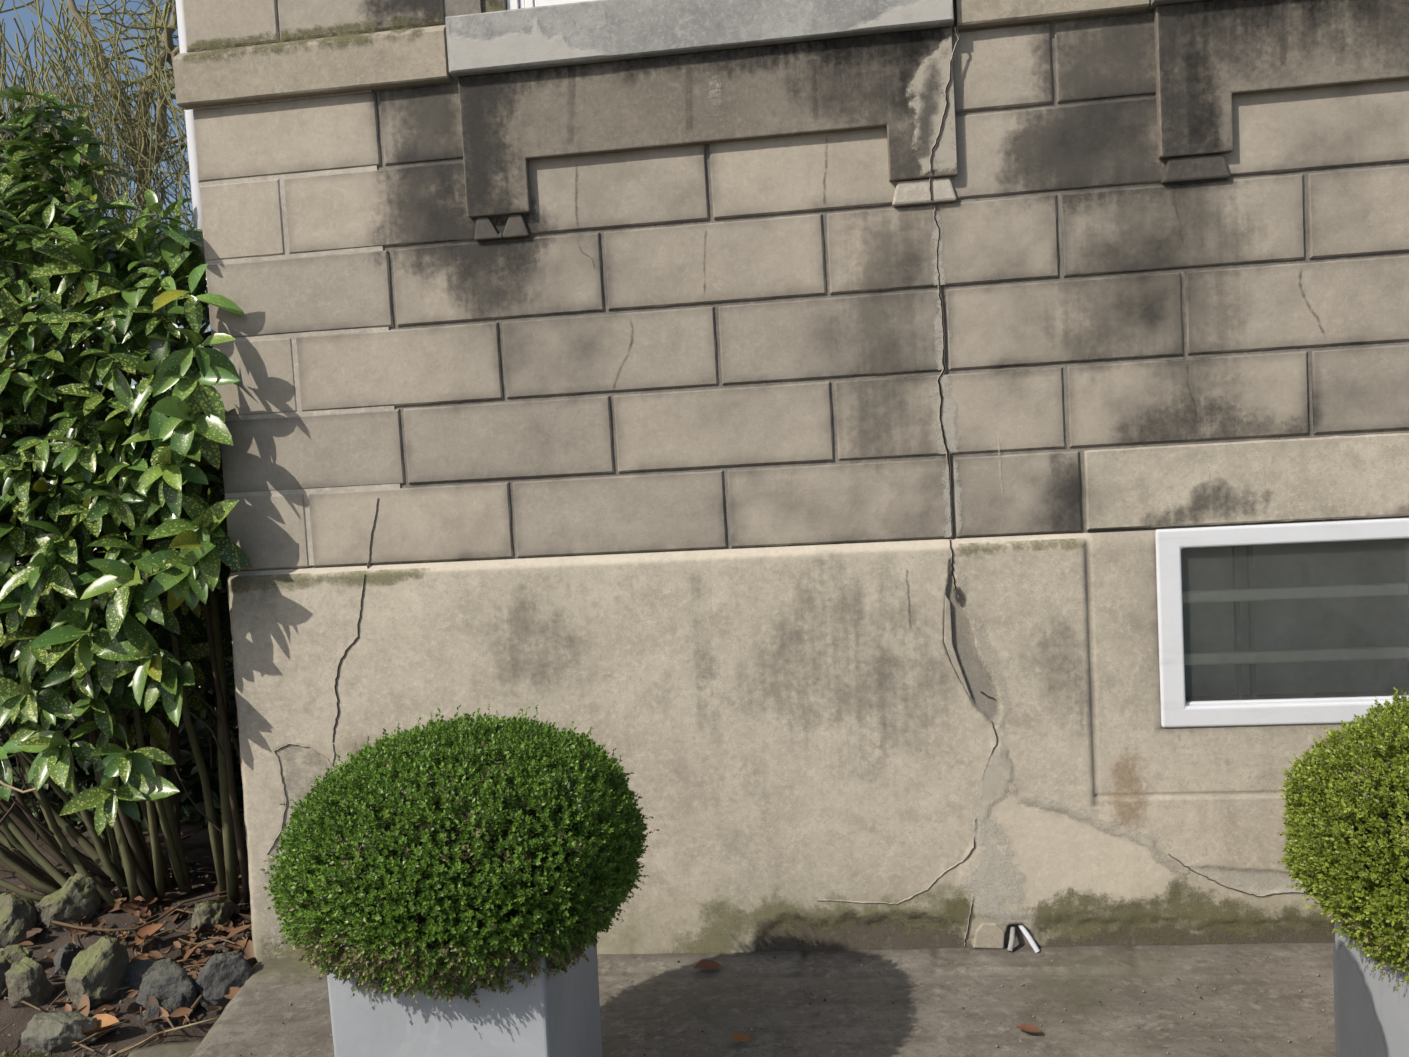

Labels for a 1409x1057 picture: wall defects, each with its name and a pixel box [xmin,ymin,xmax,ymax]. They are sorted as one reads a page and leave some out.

damp [390,85,547,261]
peeling [851,0,953,29]
peeling [908,37,957,174]
damp [1038,19,1219,155]
crack [929,26,961,589]
crack [267,498,379,855]
spalling [944,567,999,725]
crack [817,722,998,946]
crack [1168,854,1308,897]